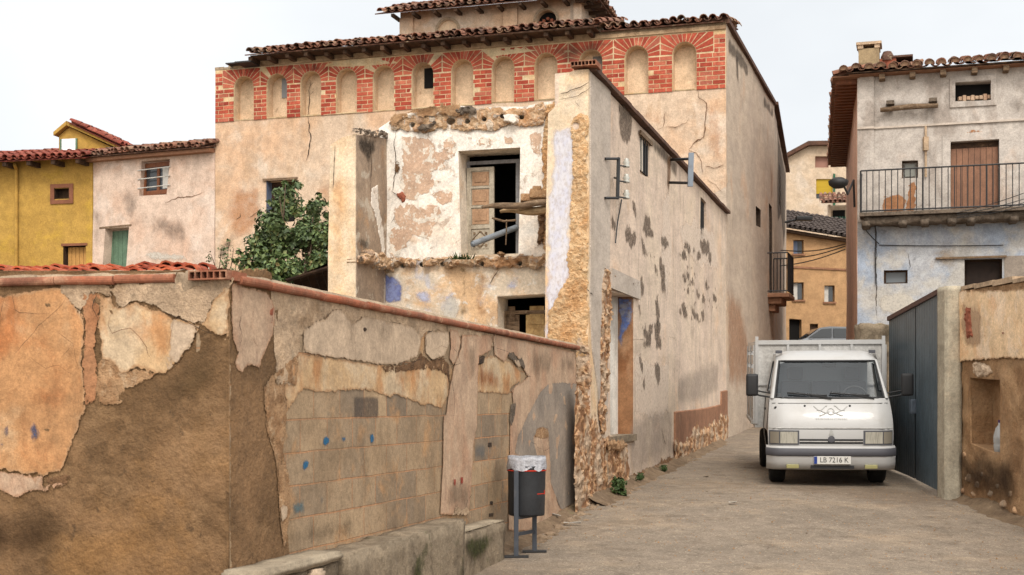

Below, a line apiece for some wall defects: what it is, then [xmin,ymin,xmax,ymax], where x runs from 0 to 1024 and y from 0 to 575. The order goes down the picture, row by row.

crack [306,85,314,160]
peeling [371,103,477,258]
peeling [477,136,513,146]
peeling [530,132,542,157]
flaking render [537,214,546,246]
crack [660,92,722,192]
peeling [612,162,717,418]
peeling [0,283,275,497]
peeling [264,309,461,547]
peeling [478,352,525,425]
flaking render [598,268,616,435]